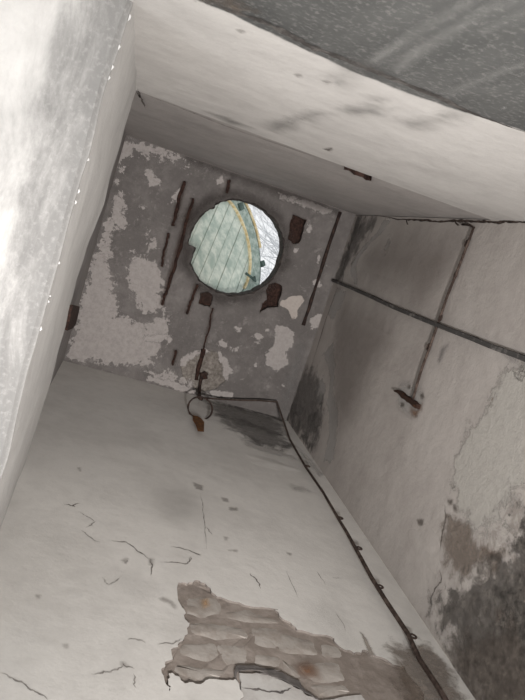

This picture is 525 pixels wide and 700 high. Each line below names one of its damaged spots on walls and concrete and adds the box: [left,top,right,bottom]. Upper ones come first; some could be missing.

peeling [277,192,333,215]
corrosion [161,181,194,306]
corrosion [288,215,305,244]
peeling [66,139,239,399]
corrosion [260,282,281,310]
peeling [280,295,304,319]
peeling [309,314,322,330]
peeling [251,325,294,372]
crack [117,499,212,574]
water stain [391,516,525,700]
flaking render [161,582,413,700]